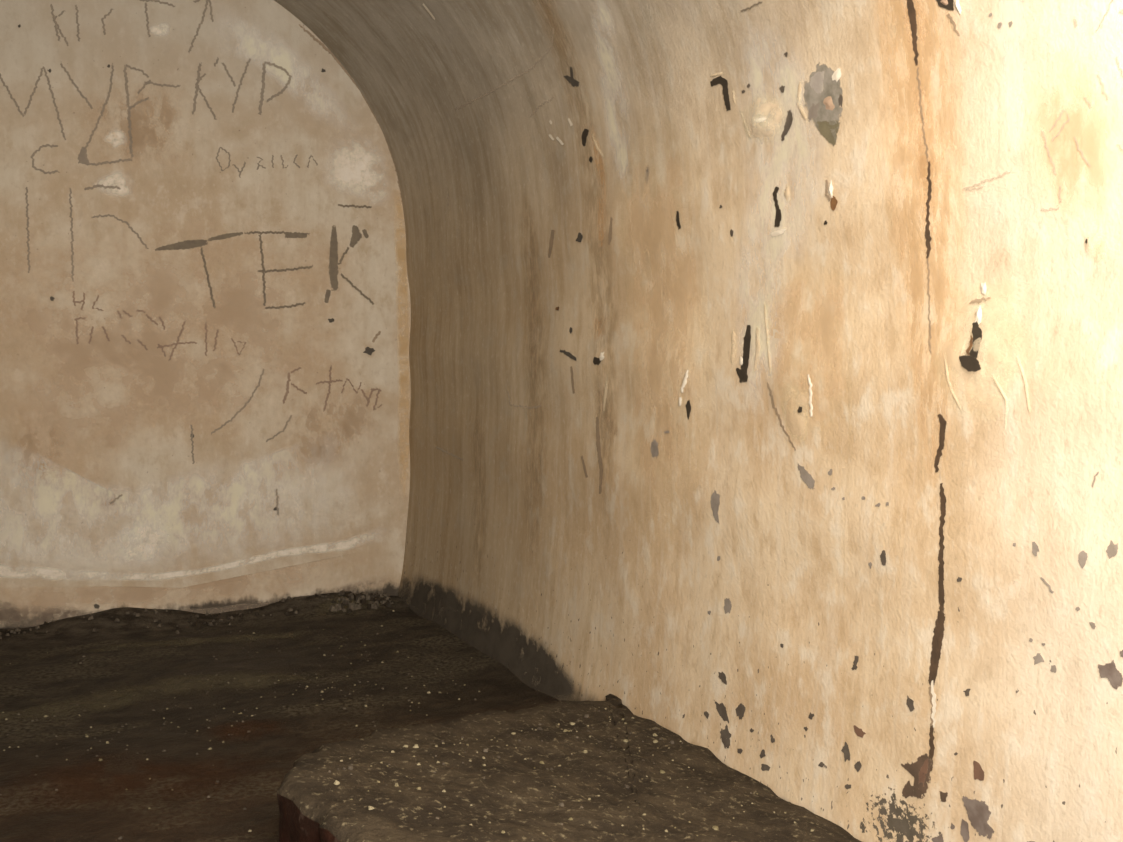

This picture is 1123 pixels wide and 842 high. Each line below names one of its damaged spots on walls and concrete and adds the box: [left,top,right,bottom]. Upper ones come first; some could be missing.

damp [106,96,175,151]
flaking render [798,62,843,146]
crack [907,0,932,353]
damp [51,272,276,405]
spalling [731,306,770,383]
spalling [959,282,991,372]
damp [301,402,364,463]
damp [22,429,183,559]
damp [0,536,371,624]
crack [928,414,946,771]
flaking render [901,753,948,802]
flaking render [932,796,994,842]